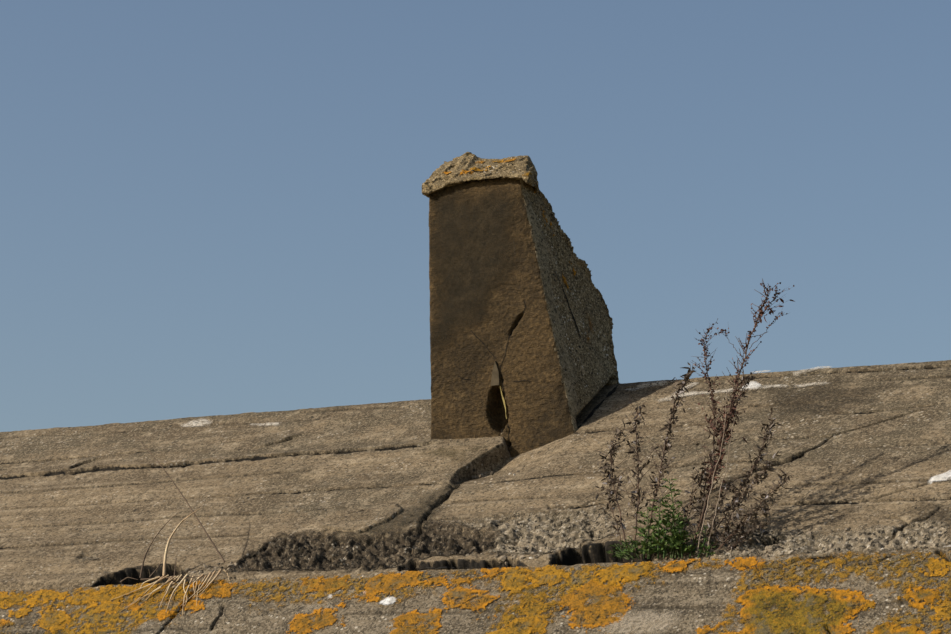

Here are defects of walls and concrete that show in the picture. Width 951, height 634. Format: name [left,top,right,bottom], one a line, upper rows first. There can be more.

crack [459,302,531,451]
crack [0,442,421,480]
damp [929,470,951,483]
crack [796,499,859,507]
spalling [218,504,623,572]